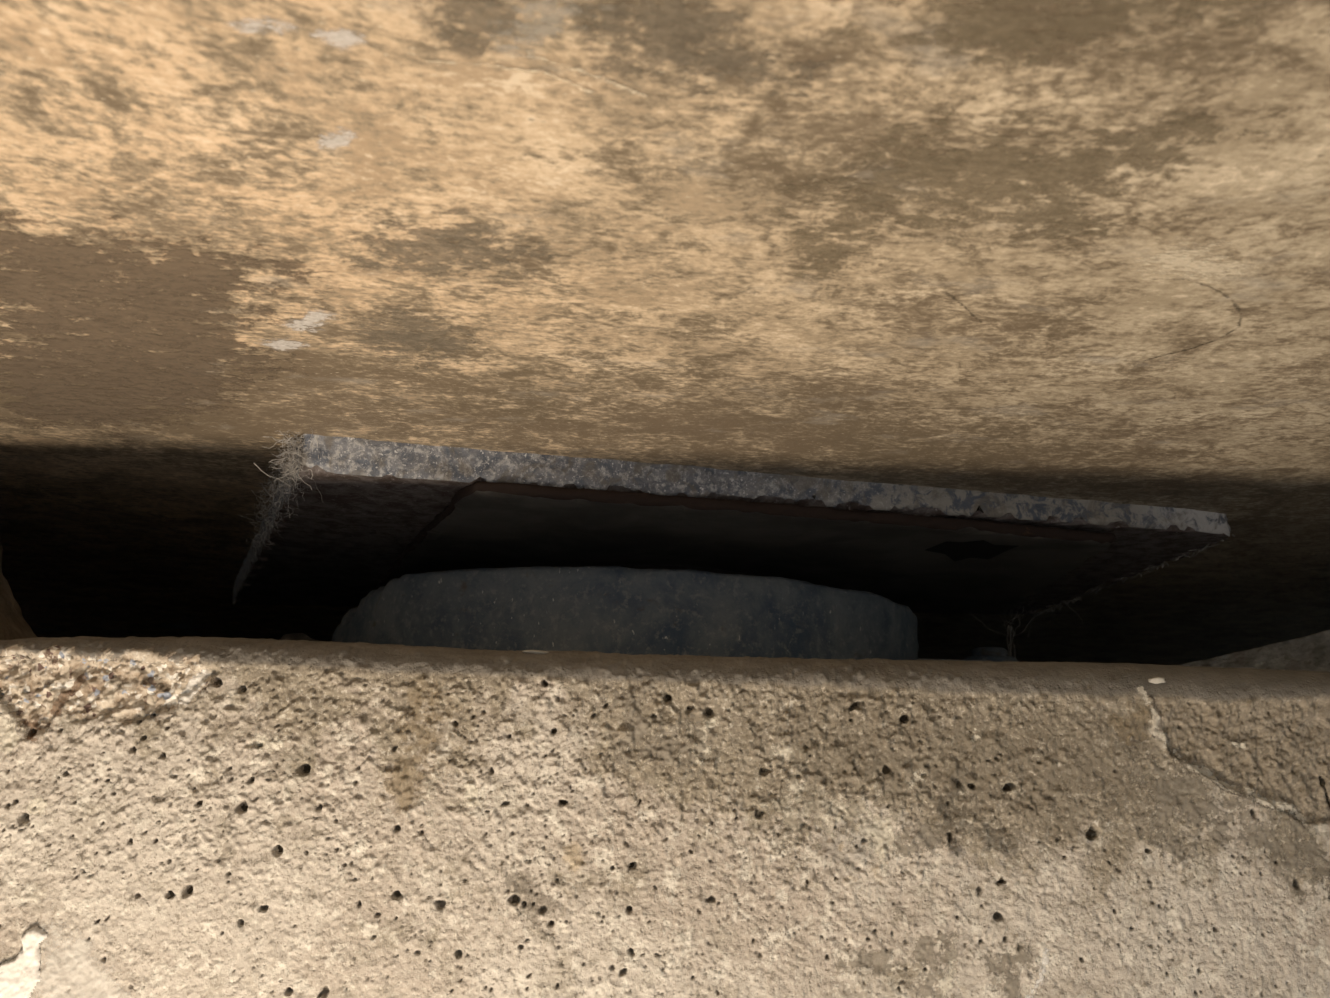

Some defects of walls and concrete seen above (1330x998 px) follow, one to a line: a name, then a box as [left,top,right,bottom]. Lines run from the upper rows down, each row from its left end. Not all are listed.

leakage [311,29,366,49]
leakage [428,0,518,56]
leakage [567,0,824,94]
leakage [892,0,1271,96]
leakage [774,109,1224,281]
leakage [351,211,552,290]
leakage [1132,238,1259,284]
leakage [0,210,335,444]
leakage [350,309,476,370]
spalling [0,644,221,754]
crack [1132,680,1330,825]
peeling [0,925,130,998]